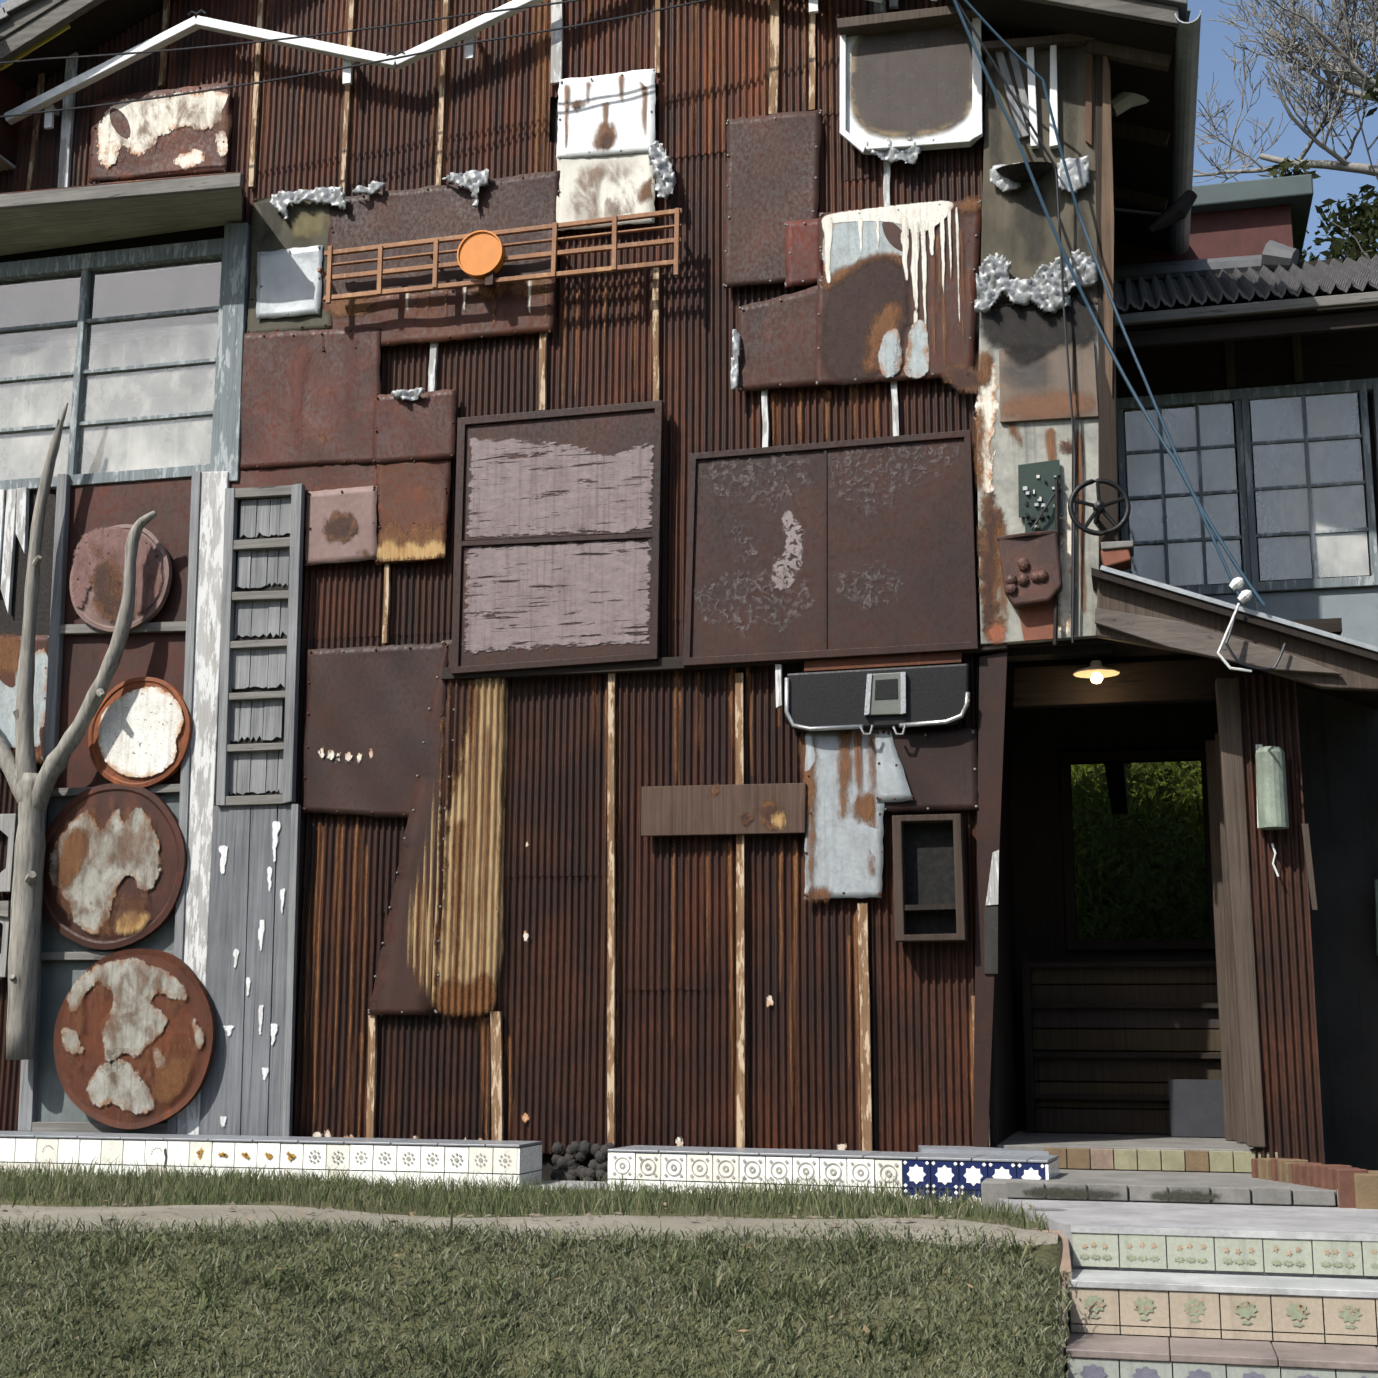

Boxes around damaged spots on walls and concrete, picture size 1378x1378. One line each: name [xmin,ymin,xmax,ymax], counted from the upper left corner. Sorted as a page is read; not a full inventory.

peeling [97,90,230,170]
rust [533,0,647,172]
water stain [849,23,1001,164]
water stain [1011,188,1046,261]
rust [819,253,909,439]
rust [363,522,445,561]
peeling [463,437,654,654]
rust [838,730,877,828]
peeling [219,845,228,874]
peeling [267,821,285,913]
rust [408,677,504,1140]
peeling [233,949,277,1045]